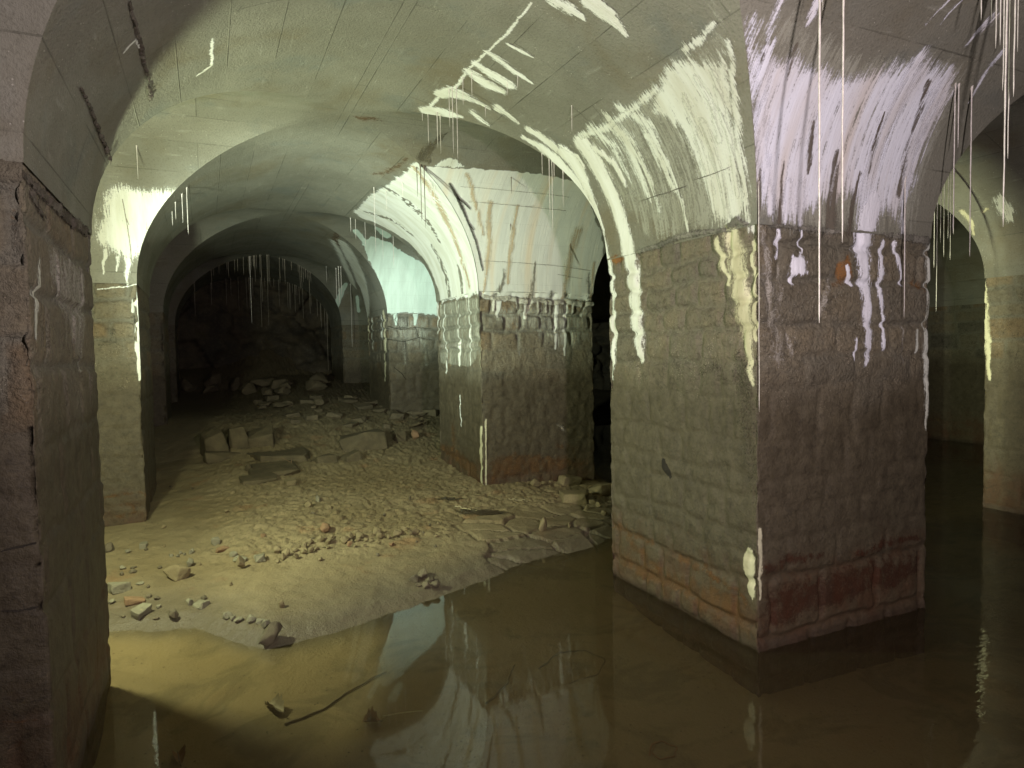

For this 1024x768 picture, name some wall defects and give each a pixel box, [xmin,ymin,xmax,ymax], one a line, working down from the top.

water stain [965,9,1000,46]
water stain [968,48,1005,104]
water stain [30,247,86,373]
water stain [95,182,175,290]
rust [467,176,492,286]
crack [449,183,590,279]
water stain [330,0,962,386]
rust [835,255,853,284]
water stain [901,241,930,429]
water stain [479,419,487,485]
water stain [743,528,763,600]